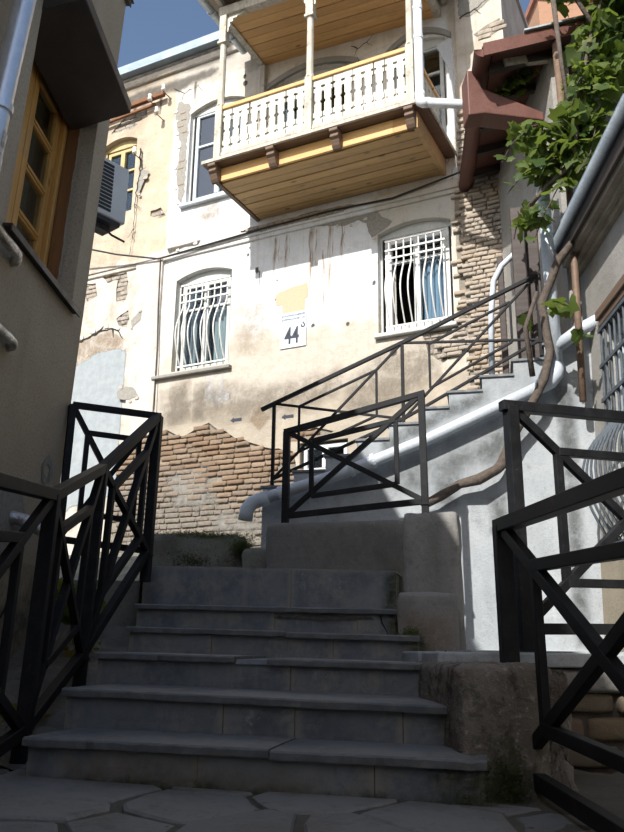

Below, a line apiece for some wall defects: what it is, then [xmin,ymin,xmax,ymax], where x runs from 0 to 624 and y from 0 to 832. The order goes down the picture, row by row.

spalling [173,102,191,205]
spalling [86,284,97,301]
spalling [104,273,128,302]
crack [79,324,123,343]
spalling [117,310,142,329]
flaking render [104,436,150,552]
flaking render [155,424,333,548]